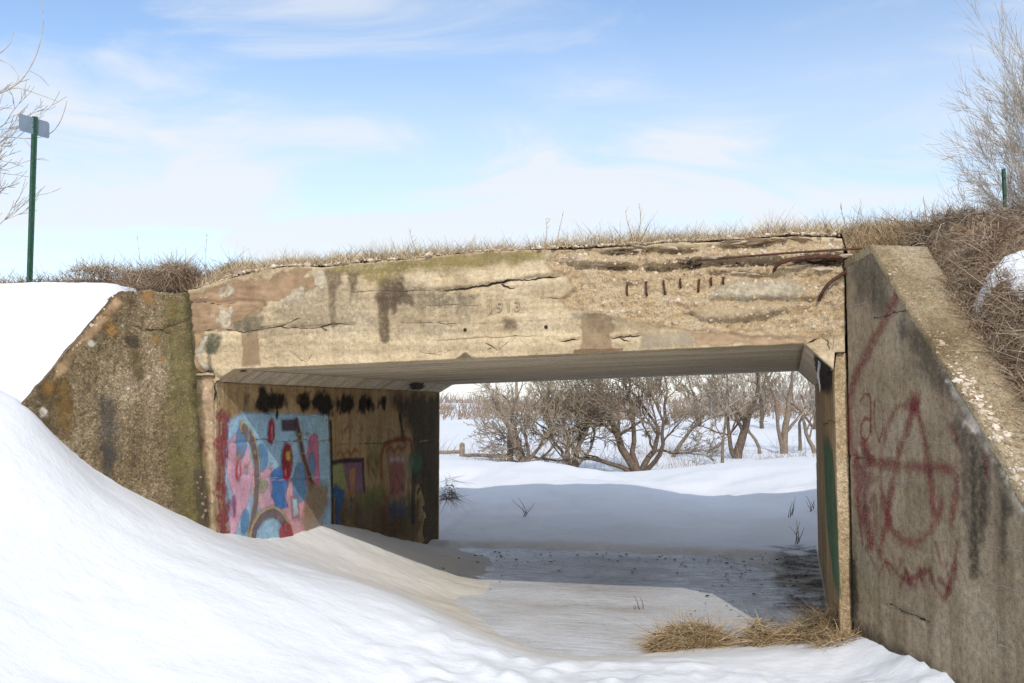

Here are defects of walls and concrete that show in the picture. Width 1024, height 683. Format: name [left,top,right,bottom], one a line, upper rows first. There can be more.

crack [135,301,354,334]
leakage [376,277,413,342]
crack [350,276,560,355]
spalling [547,236,853,353]